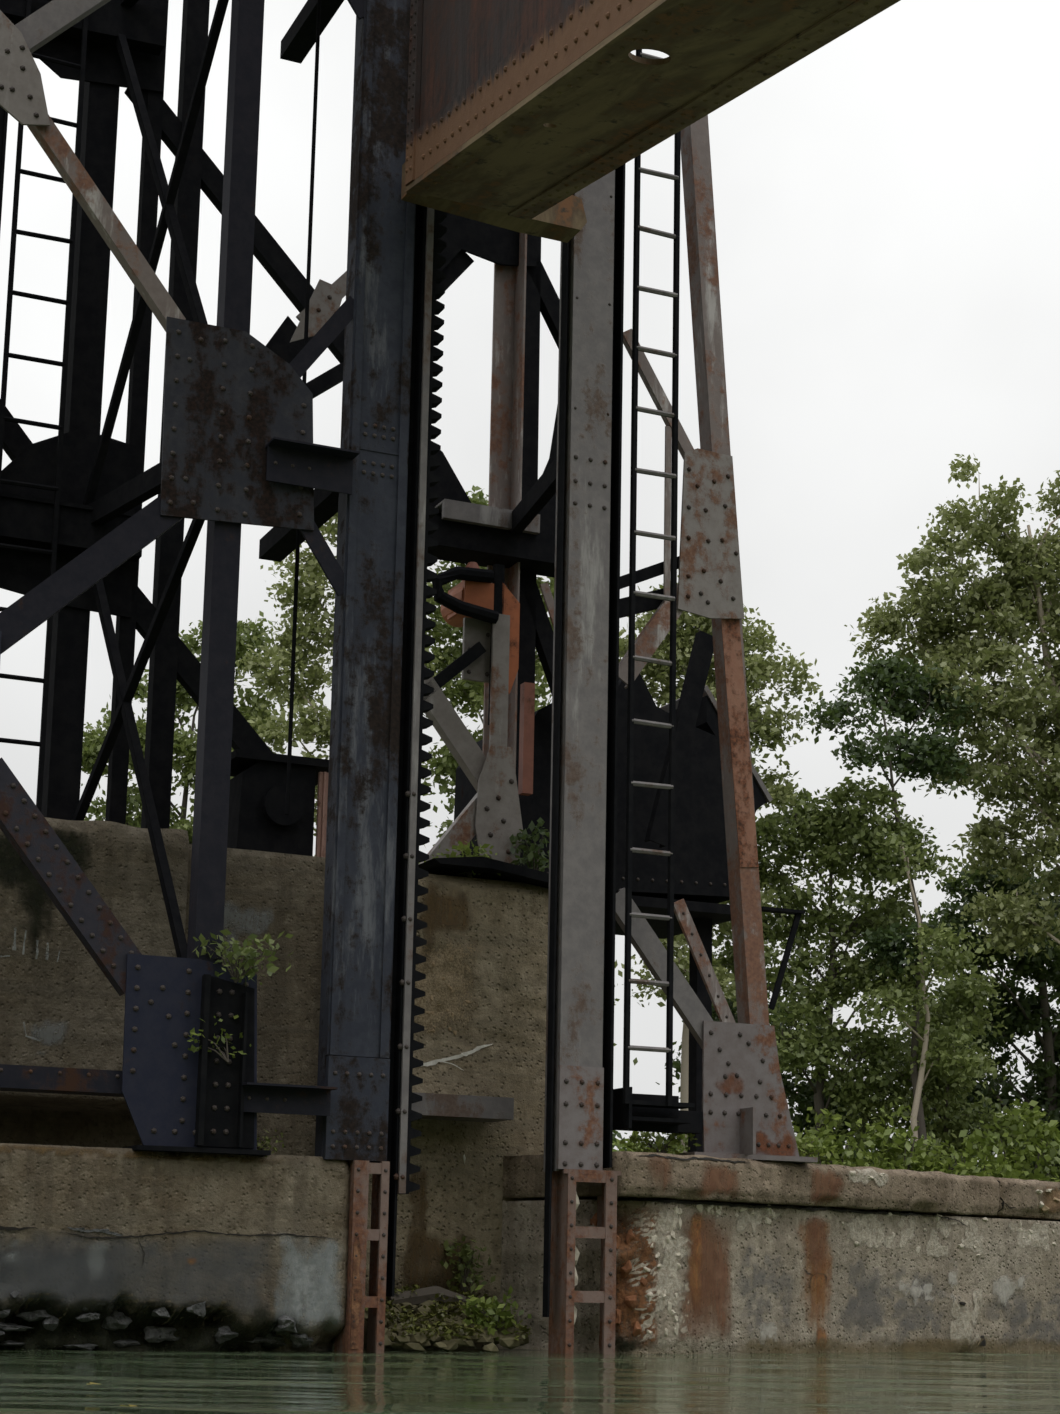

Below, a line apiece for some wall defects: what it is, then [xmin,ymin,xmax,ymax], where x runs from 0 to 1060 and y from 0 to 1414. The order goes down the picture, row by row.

corrosion [756,1131,795,1156]
crack [0,1226,339,1268]
corrosion [683,1217,730,1333]
corrosion [806,1170,843,1349]